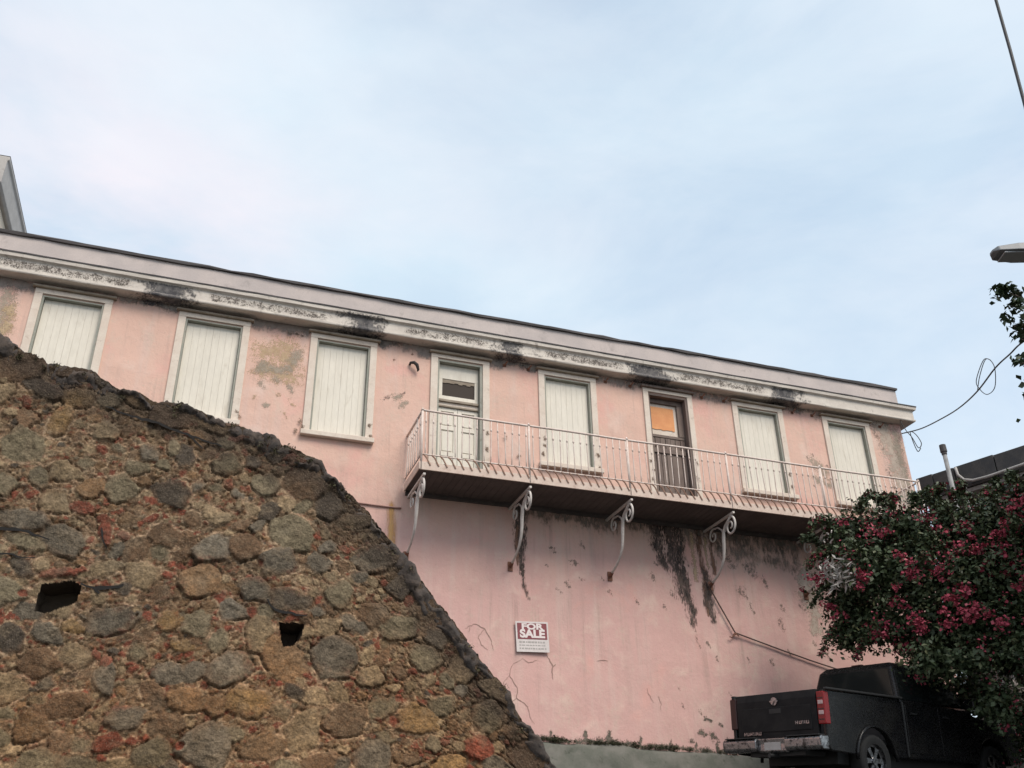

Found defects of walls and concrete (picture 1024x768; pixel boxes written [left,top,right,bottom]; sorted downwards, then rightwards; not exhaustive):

spalling [248,333,305,433]
leakage [0,258,887,426]
leakage [512,508,803,647]
crack [467,624,556,724]